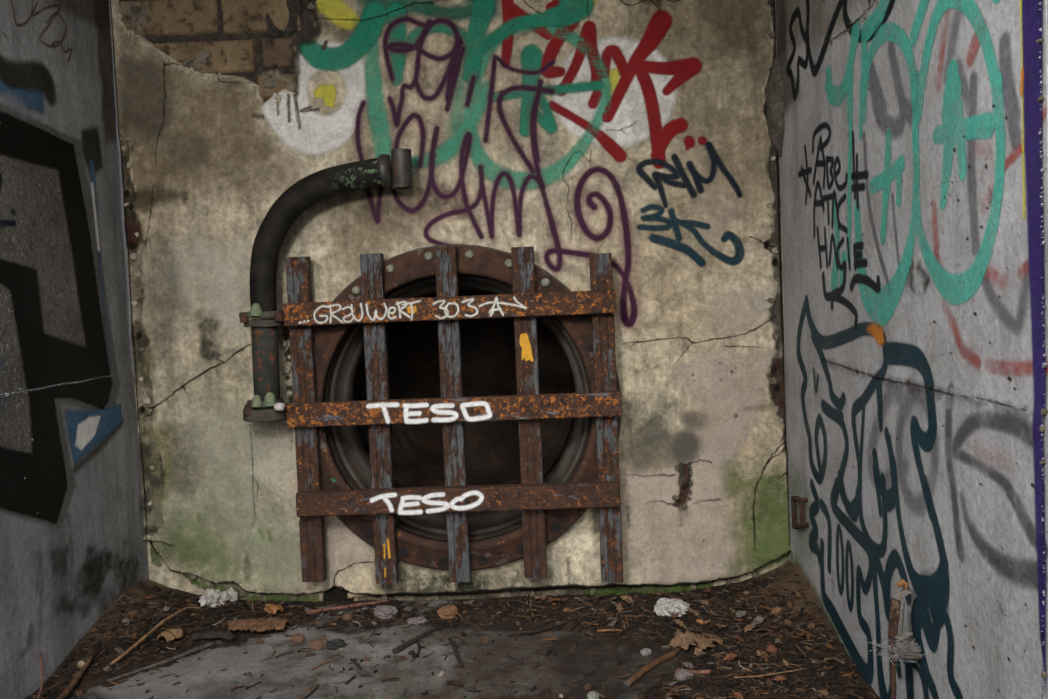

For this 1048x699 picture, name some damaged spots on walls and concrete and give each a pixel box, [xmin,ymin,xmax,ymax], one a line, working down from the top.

flaking render [115,0,328,129]
spalling [120,145,145,260]
spalling [130,320,165,513]
crack [147,344,251,416]
peeling [143,145,791,601]
crack [633,316,775,359]